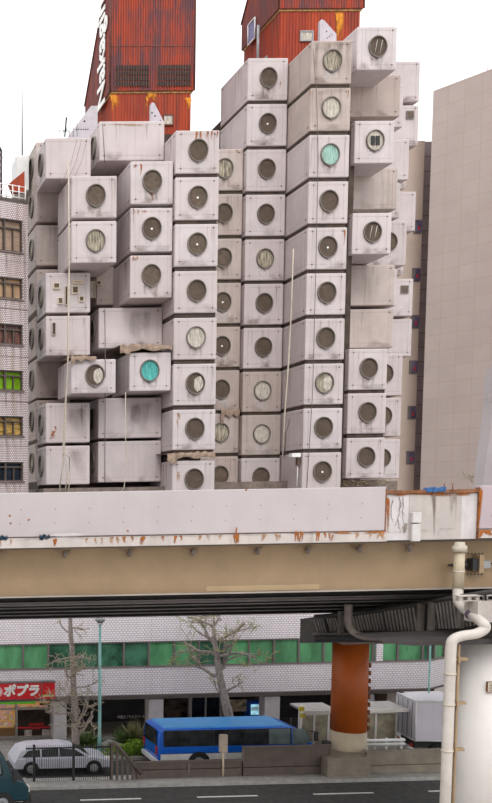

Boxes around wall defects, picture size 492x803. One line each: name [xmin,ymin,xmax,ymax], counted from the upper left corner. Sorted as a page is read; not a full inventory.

corrosion [387,493,469,520]
corrosion [478,489,492,537]
corrosion [316,531,386,540]